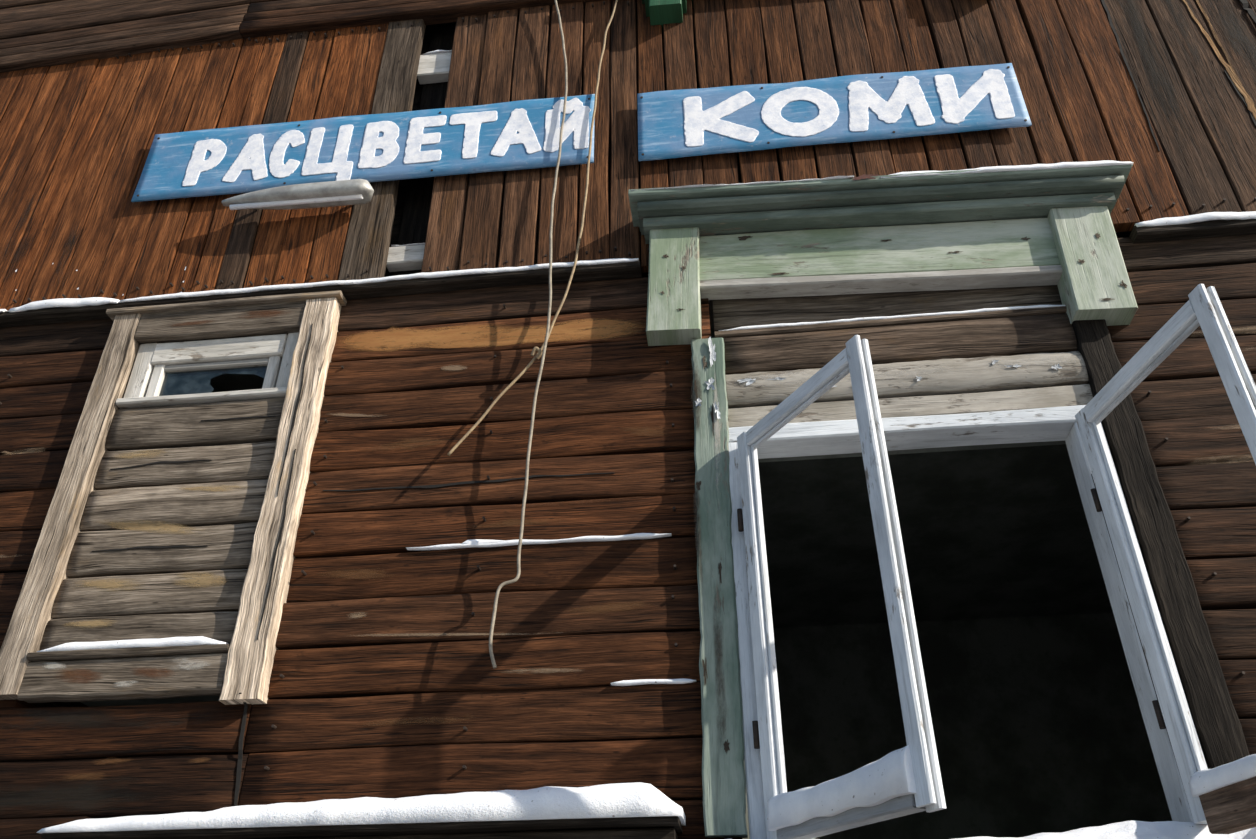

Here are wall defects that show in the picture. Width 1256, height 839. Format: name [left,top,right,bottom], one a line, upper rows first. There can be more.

crack [1182,0,1256,126]
peeling [692,337,721,447]
peeling [702,627,724,694]